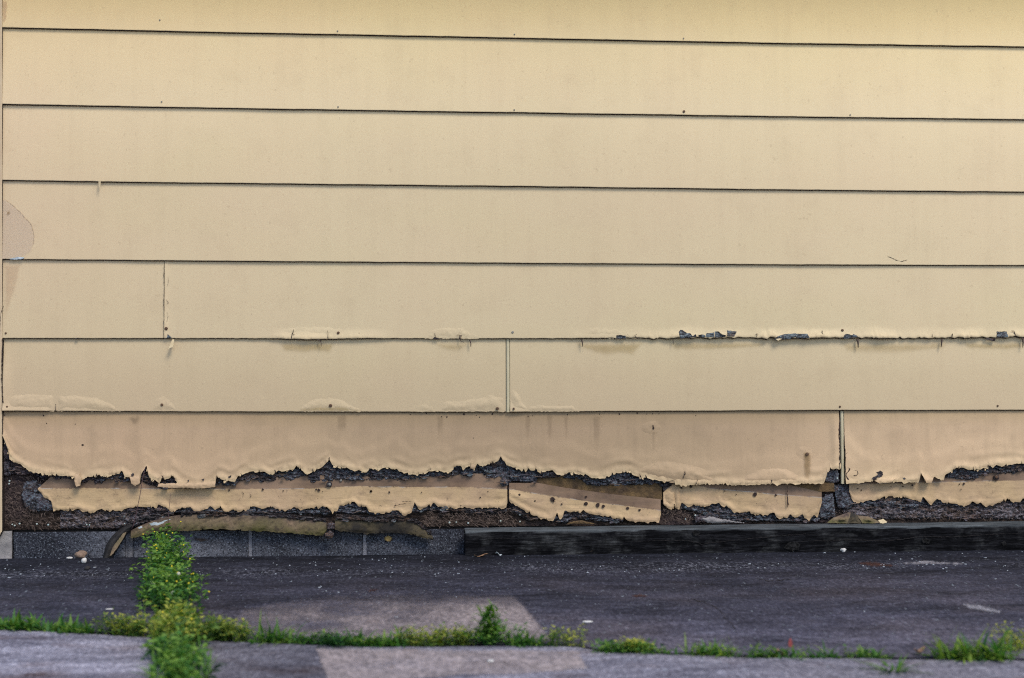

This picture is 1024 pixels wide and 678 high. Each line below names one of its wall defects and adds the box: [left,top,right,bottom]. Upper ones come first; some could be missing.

peeling [672,330,737,344]
peeling [3,440,672,540]
spalling [680,468,1024,523]
spalling [923,463,1024,483]